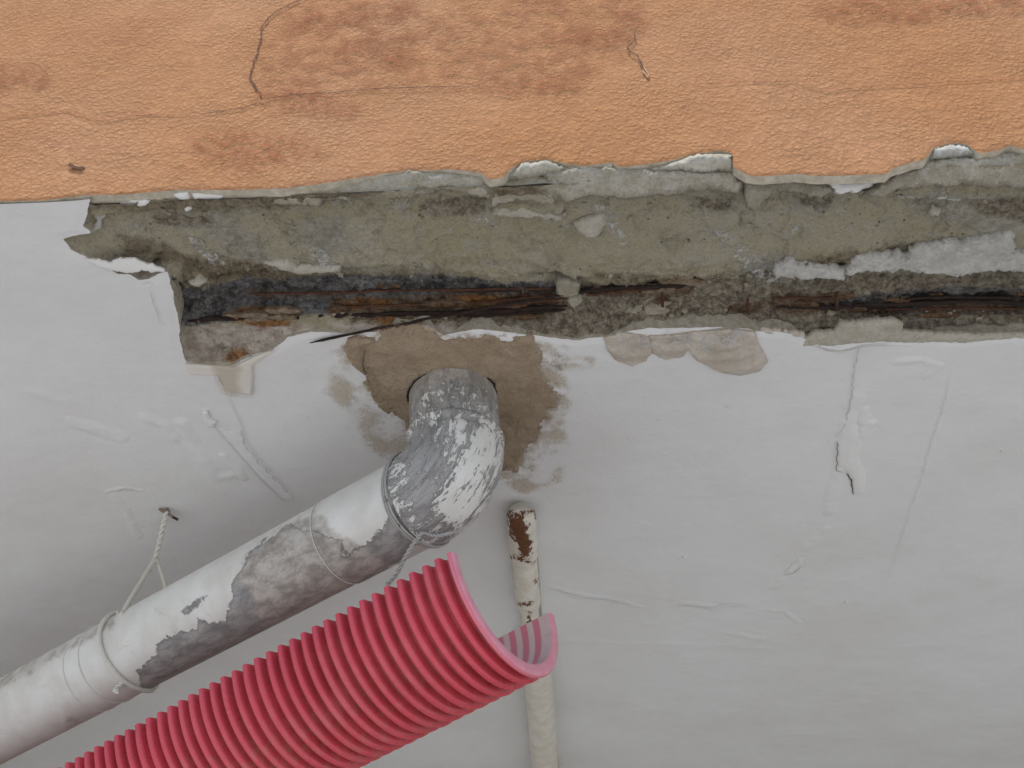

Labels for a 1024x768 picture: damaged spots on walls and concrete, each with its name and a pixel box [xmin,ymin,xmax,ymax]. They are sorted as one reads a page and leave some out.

crack [1,0,460,121]
crack [627,32,650,79]
spalling [65,144,1024,398]
crack [820,343,879,517]